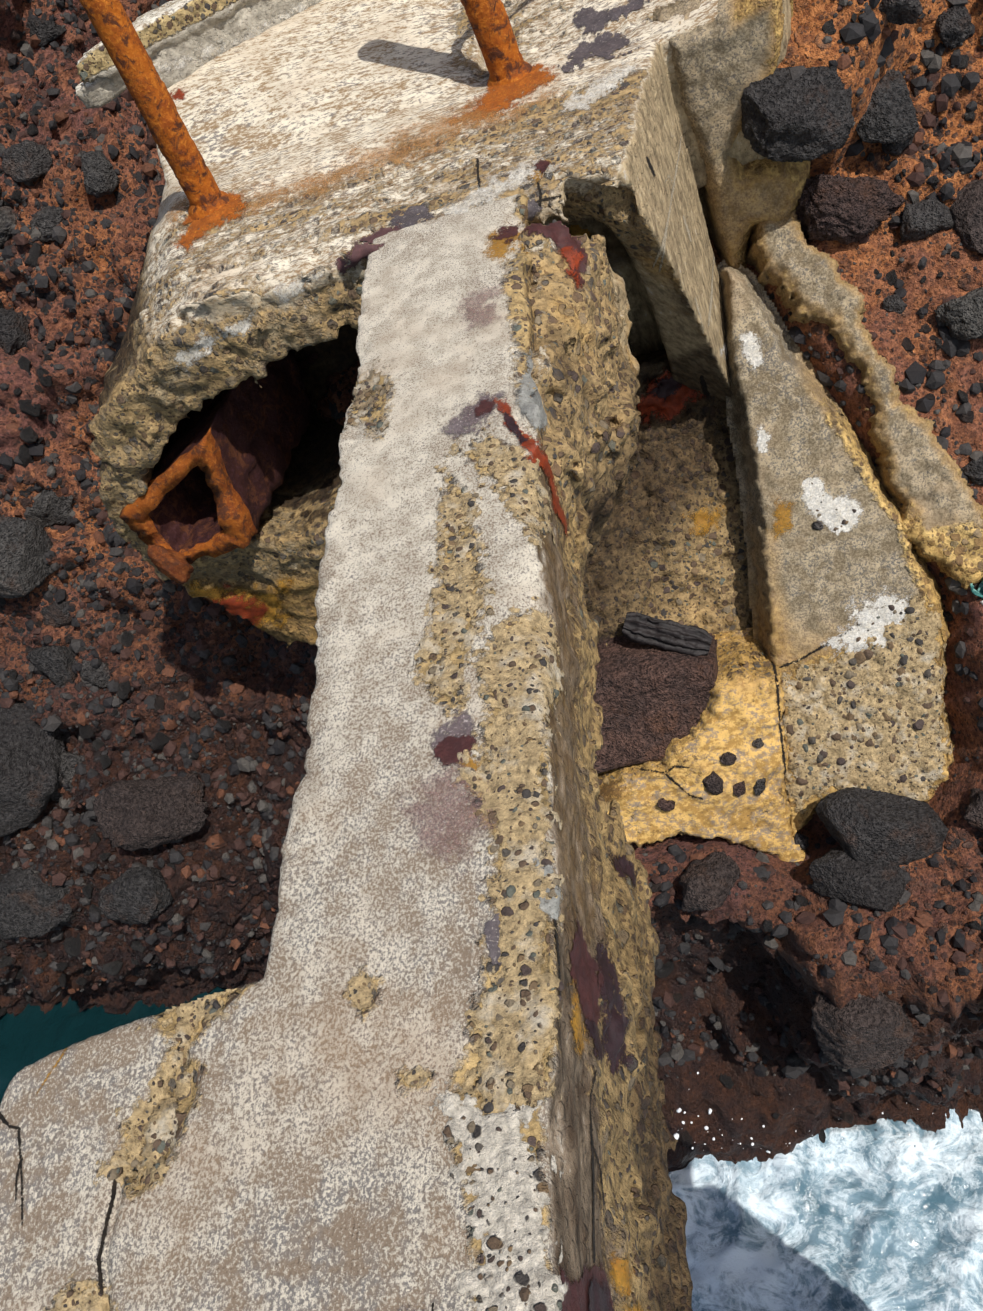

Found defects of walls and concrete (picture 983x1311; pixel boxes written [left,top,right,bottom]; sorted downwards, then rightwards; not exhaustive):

spalling [344,356,395,438]
corrosion [441,386,568,537]
crack [772,624,860,786]
spalling [781,585,954,815]
crack [636,765,703,799]
crack [96,1156,130,1295]